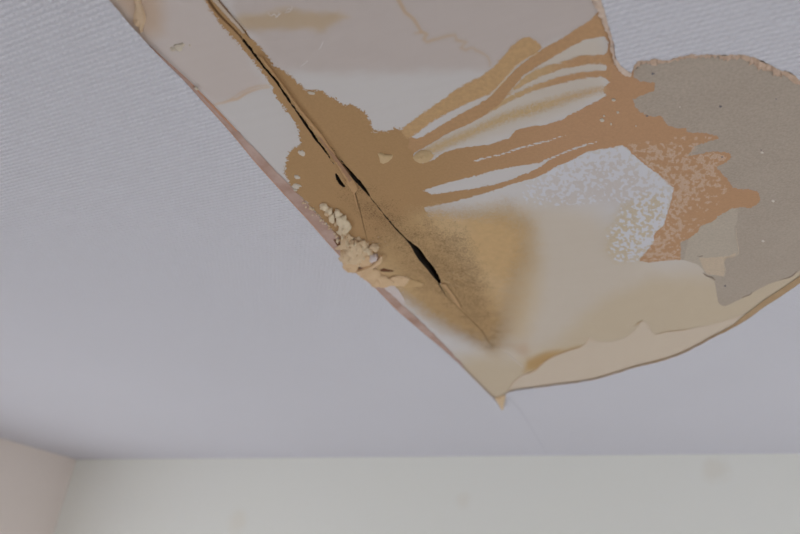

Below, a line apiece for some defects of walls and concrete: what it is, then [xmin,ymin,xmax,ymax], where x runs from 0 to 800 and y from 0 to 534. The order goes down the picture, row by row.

crack [207,0,499,348]
flaking render [302,199,424,306]
leakage [205,0,760,357]